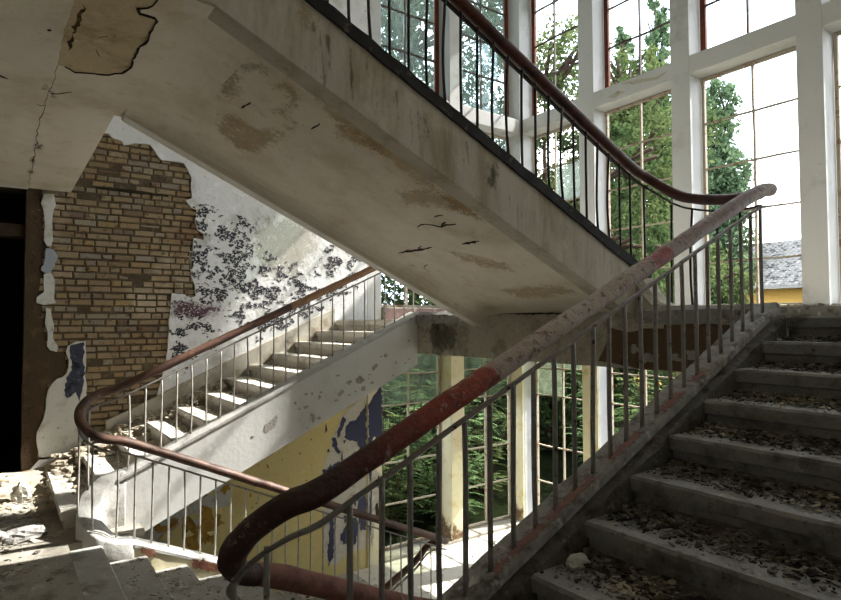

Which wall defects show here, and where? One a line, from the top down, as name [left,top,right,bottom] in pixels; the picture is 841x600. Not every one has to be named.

spalling [58,0,158,76]
crack [27,66,71,185]
flaking render [21,133,361,472]
damp [427,324,457,355]
peeling [294,354,388,474]
peeling [322,469,381,566]